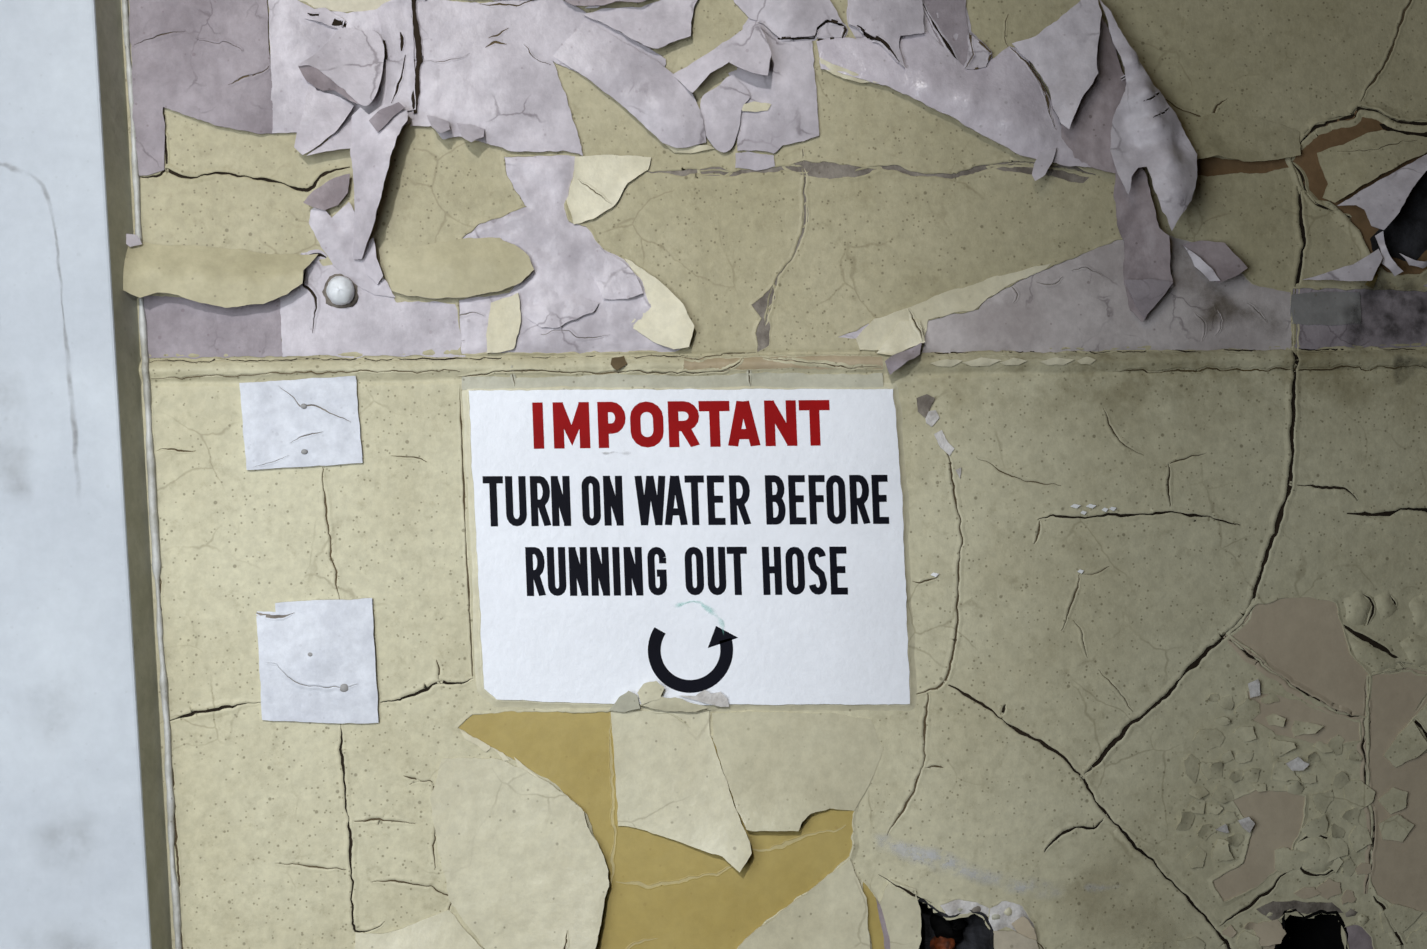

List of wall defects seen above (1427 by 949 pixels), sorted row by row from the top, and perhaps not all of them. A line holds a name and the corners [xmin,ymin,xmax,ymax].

crack [1359,0,1416,101]
peeling [123,0,1427,390]
crack [149,354,692,949]
peeling [916,394,961,478]
peeling [1070,504,1116,515]
crack [885,185,1427,949]
peeling [355,681,883,949]
spalling [859,873,1047,949]